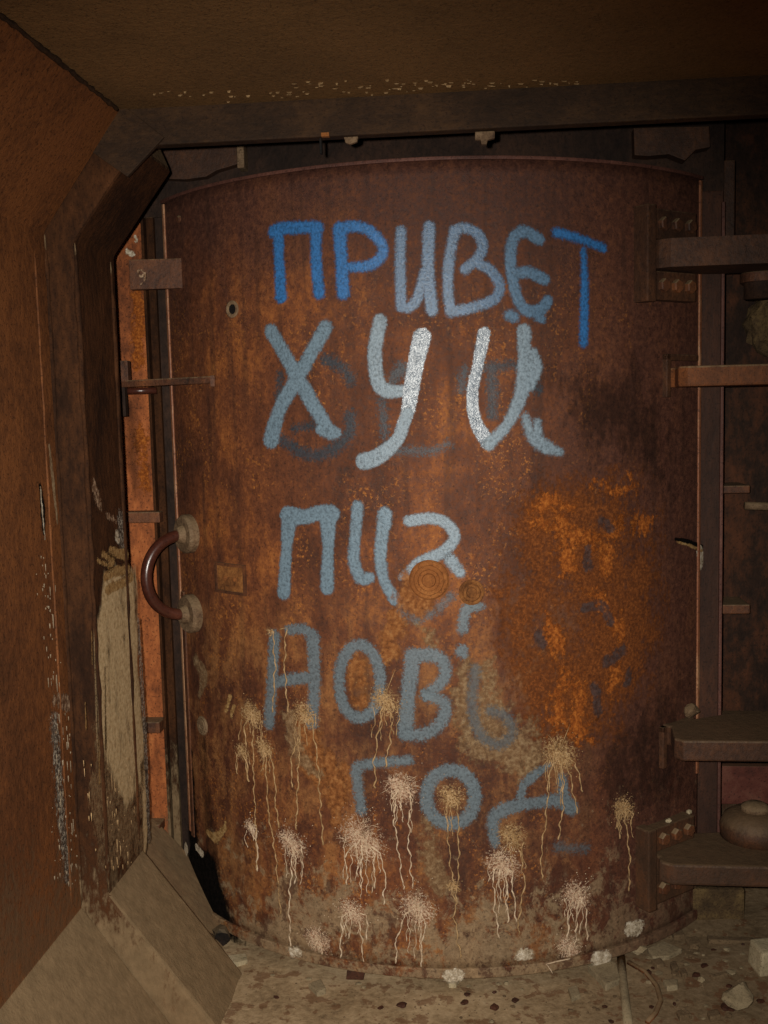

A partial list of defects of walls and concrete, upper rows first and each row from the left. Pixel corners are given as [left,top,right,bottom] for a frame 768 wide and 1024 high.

corrosion [130,290,146,372]
corrosion [380,567,449,665]
corrosion [490,464,669,748]
peeling [89,568,148,869]
corrosion [347,651,368,707]
corrosion [282,709,356,827]
leakage [288,946,302,958]
leakage [514,948,533,961]
leakage [591,949,611,966]
leakage [624,919,645,937]